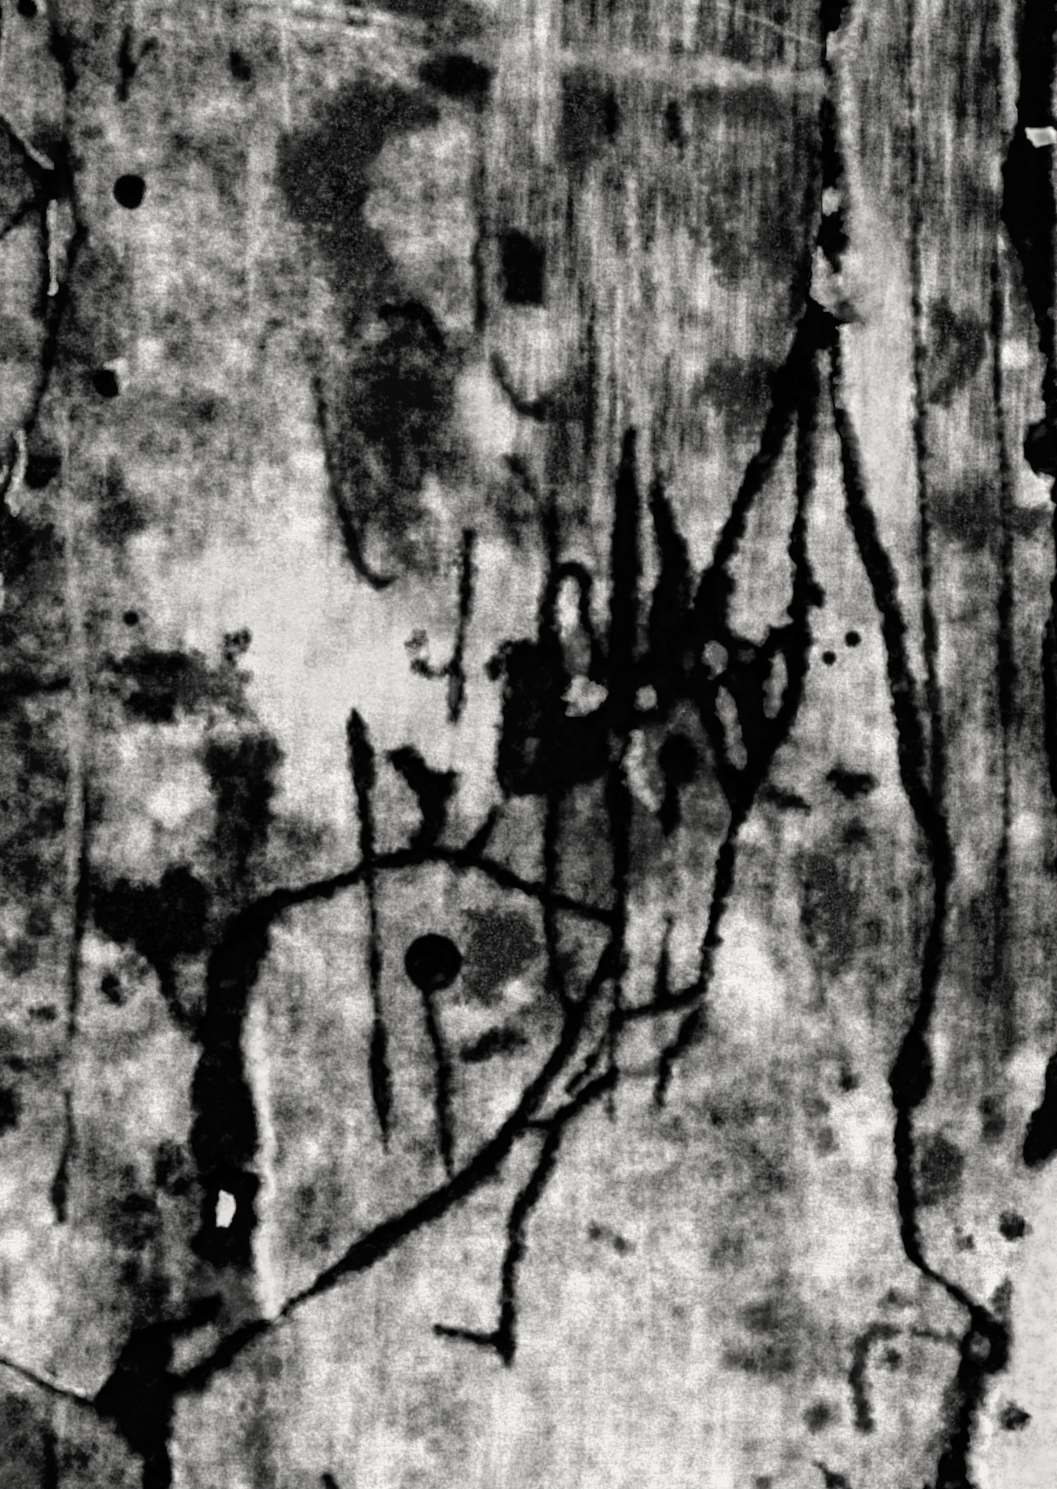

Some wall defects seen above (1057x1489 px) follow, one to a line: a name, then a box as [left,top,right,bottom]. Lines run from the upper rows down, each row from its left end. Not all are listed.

crack [115,28,157,102]
crack [0,28,90,548]
water stain [277,54,492,350]
crack [67,768,94,1038]
water stain [90,630,284,1034]
water stain [386,537,457,576]
water stain [499,639,518,666]
crack [176,0,986,1396]
water stain [562,613,611,712]
water stain [557,693,730,879]
crack [989,0,1057,907]
crack [50,1090,74,1225]